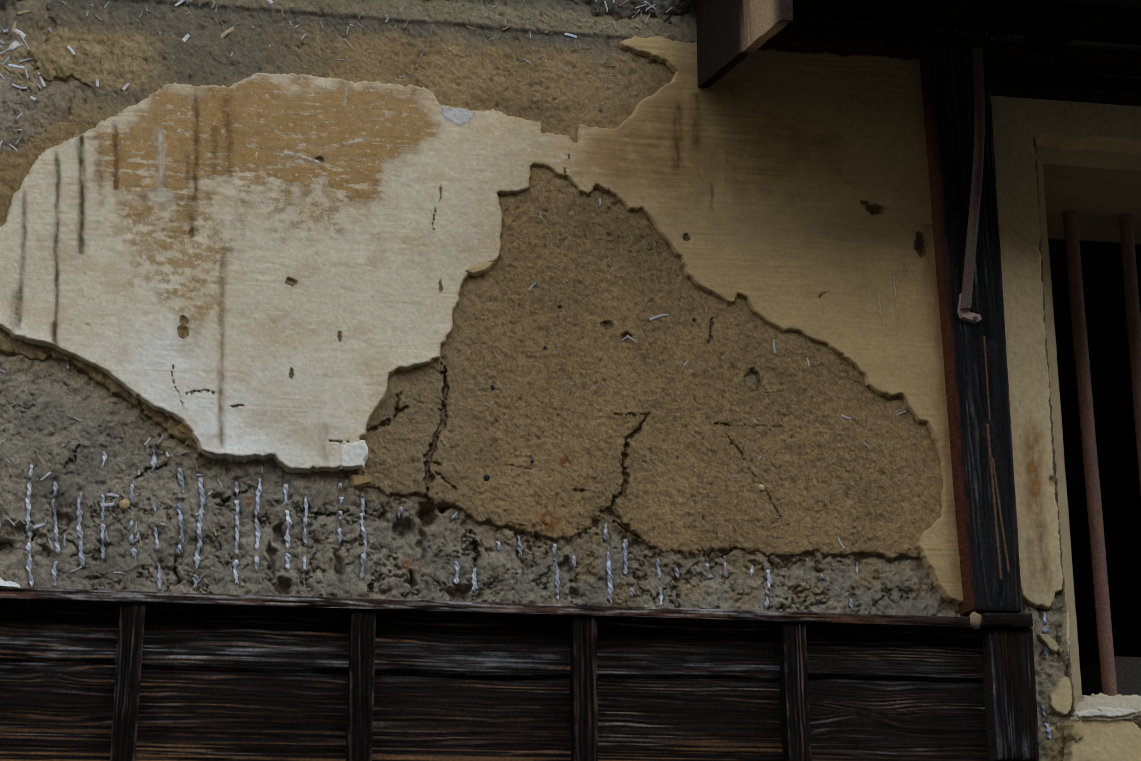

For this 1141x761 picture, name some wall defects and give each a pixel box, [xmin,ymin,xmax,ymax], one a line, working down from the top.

spalling [0,0,697,227]
water stain [79,75,438,358]
spalling [0,328,202,455]
crack [329,391,410,444]
crack [423,357,458,506]
crack [573,412,650,545]
spalling [339,165,943,562]
spalling [1022,594,1141,761]